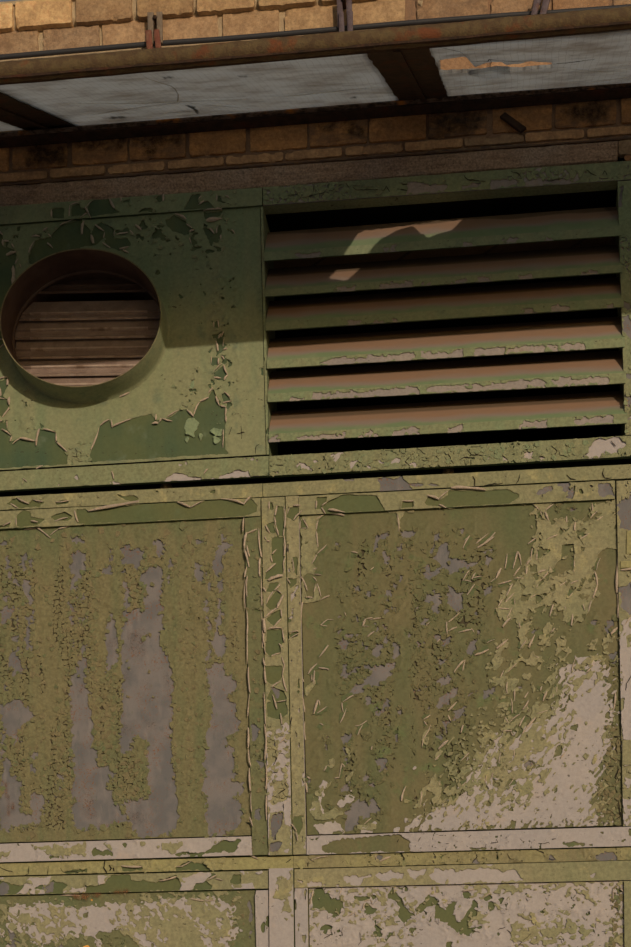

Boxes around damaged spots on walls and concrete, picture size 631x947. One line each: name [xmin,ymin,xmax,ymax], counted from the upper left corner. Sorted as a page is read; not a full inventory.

peeling [34,189,236,270]
spalling [262,270,616,307]
peeling [0,284,631,947]